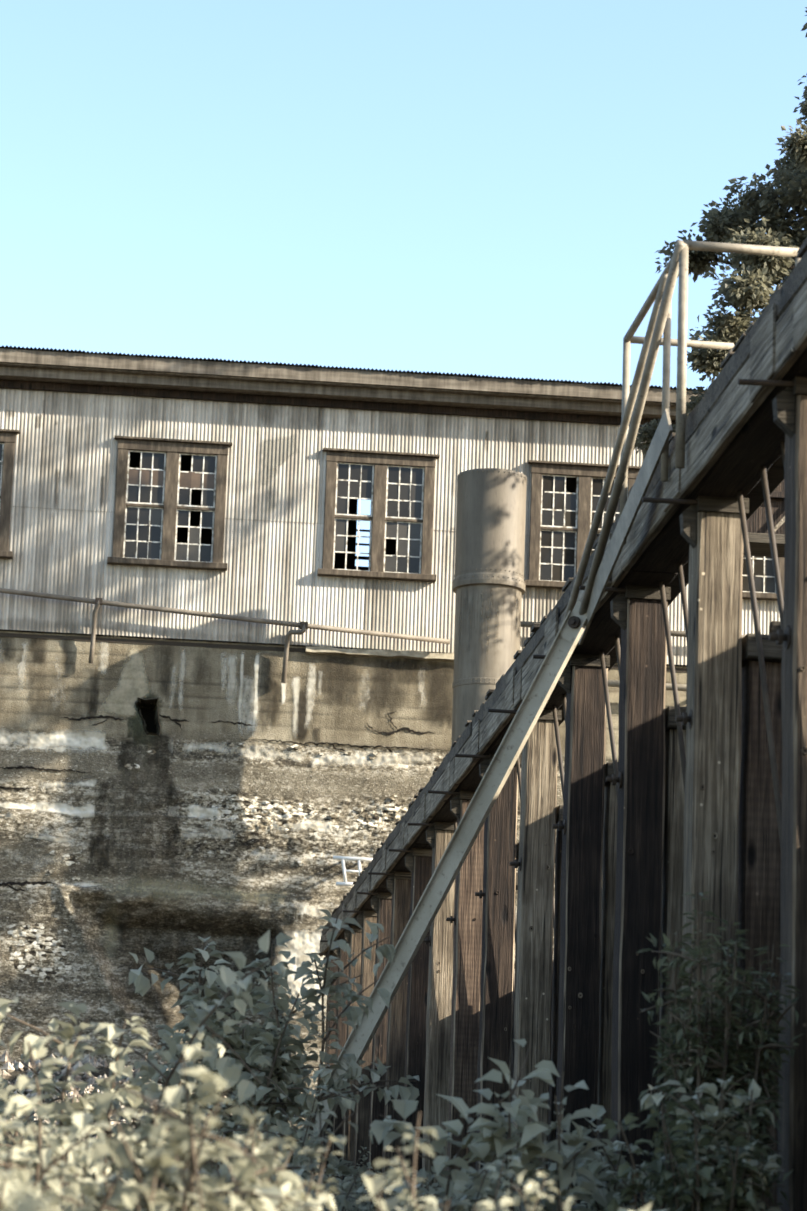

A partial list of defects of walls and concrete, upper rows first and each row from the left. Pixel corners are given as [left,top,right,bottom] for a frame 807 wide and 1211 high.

damp [91,644,106,711]
damp [0,729,107,754]
crack [60,715,128,726]
peeling [101,649,161,769]
damp [120,649,453,769]
crack [159,711,444,752]
damp [168,789,233,850]
damp [272,820,331,832]